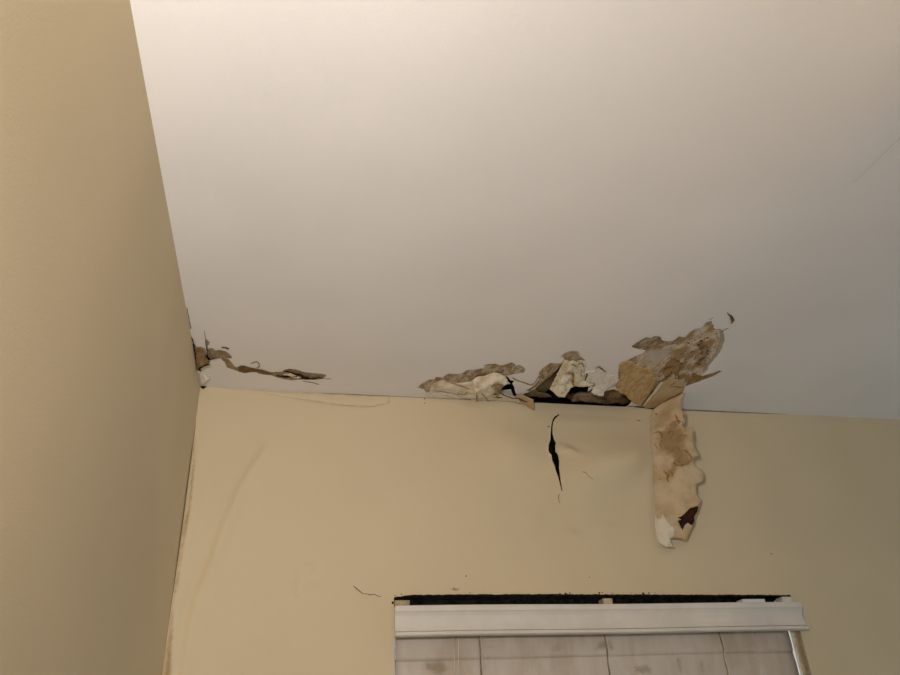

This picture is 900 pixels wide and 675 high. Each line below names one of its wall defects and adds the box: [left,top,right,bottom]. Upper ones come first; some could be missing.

spalling [501,376,517,396]
flaking render [529,318,728,409]
crack [546,414,562,503]